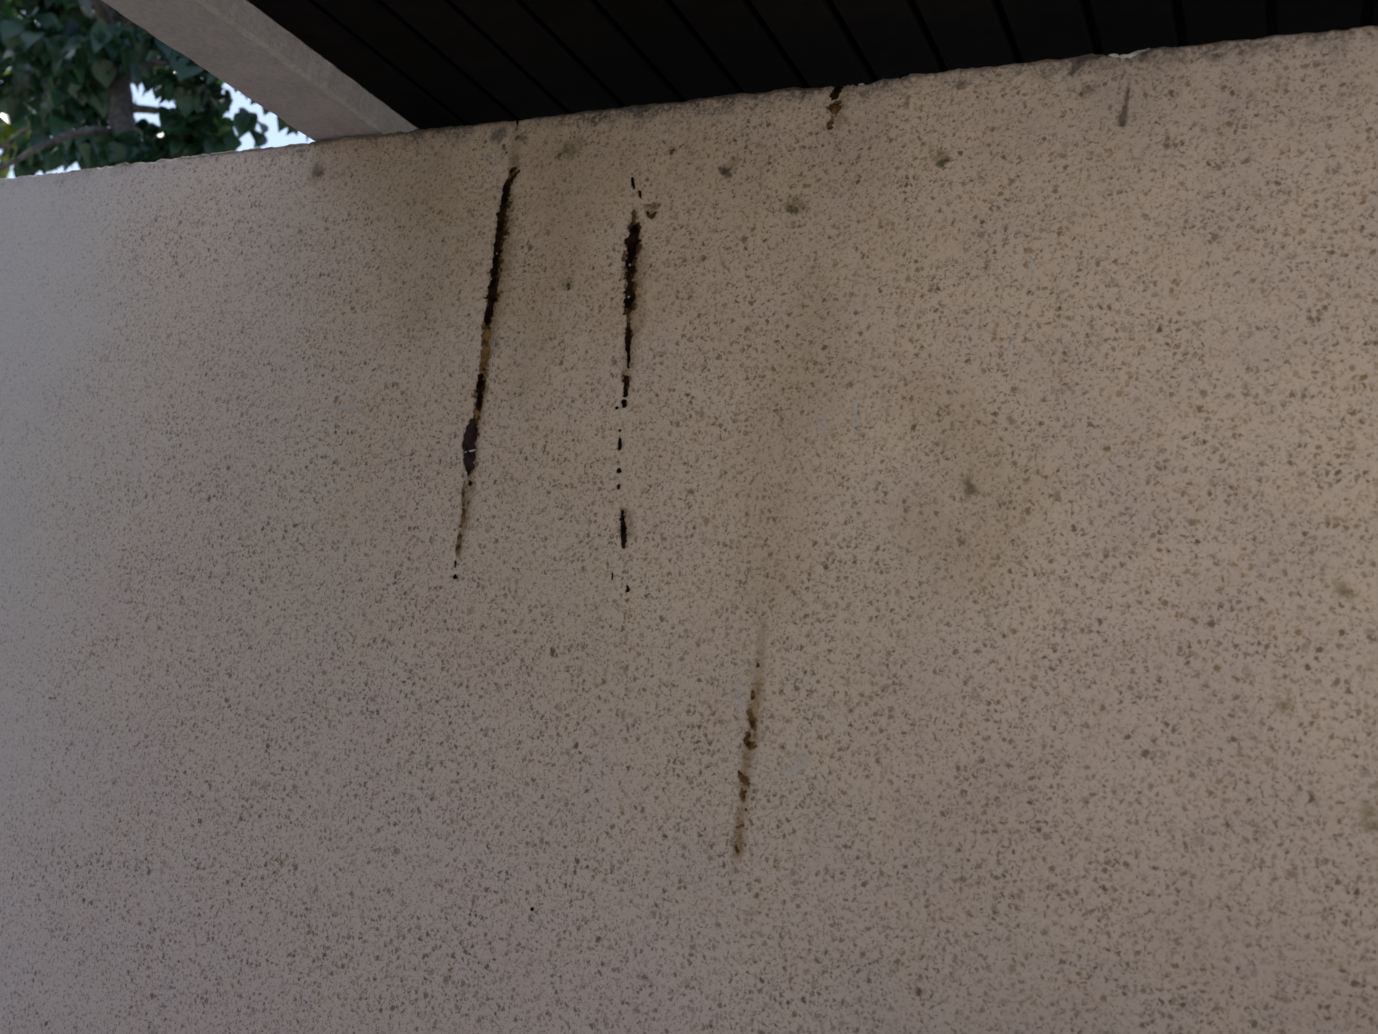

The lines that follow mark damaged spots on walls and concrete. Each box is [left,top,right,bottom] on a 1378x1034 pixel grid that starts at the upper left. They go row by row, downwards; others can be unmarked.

crack [453,120,521,579]
crack [612,173,643,592]
corrosion [734,663,760,855]